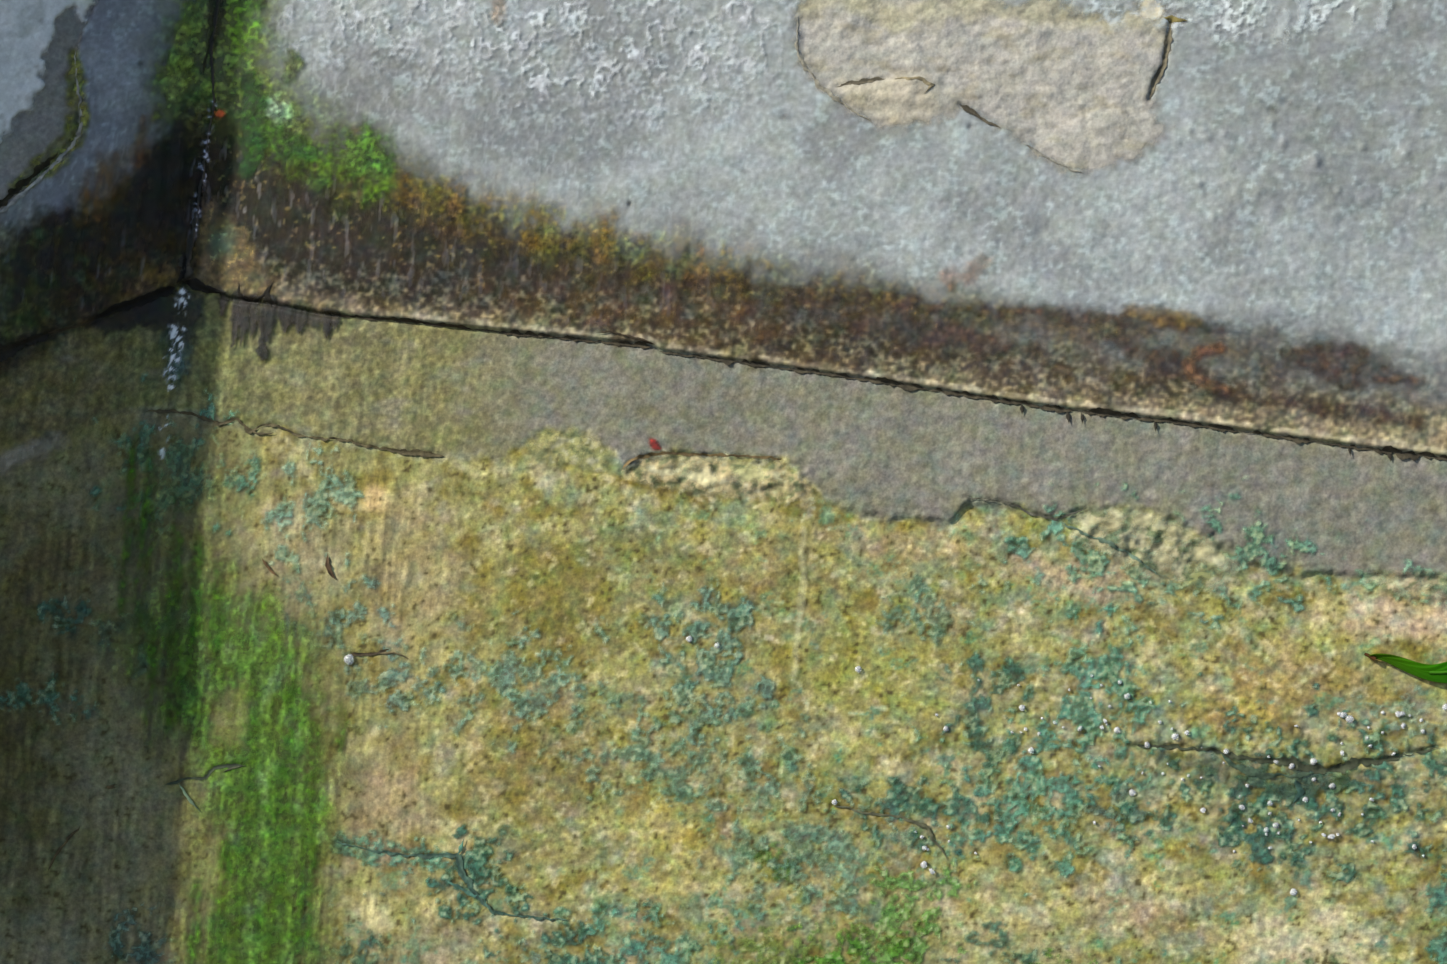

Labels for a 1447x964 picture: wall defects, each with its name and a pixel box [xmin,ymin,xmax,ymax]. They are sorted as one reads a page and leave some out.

spalling [794,0,1187,173]
crack [0,0,226,362]
water stain [0,96,1423,428]
crack [146,409,443,458]
crack [327,313,1447,461]
crack [1134,744,1436,803]